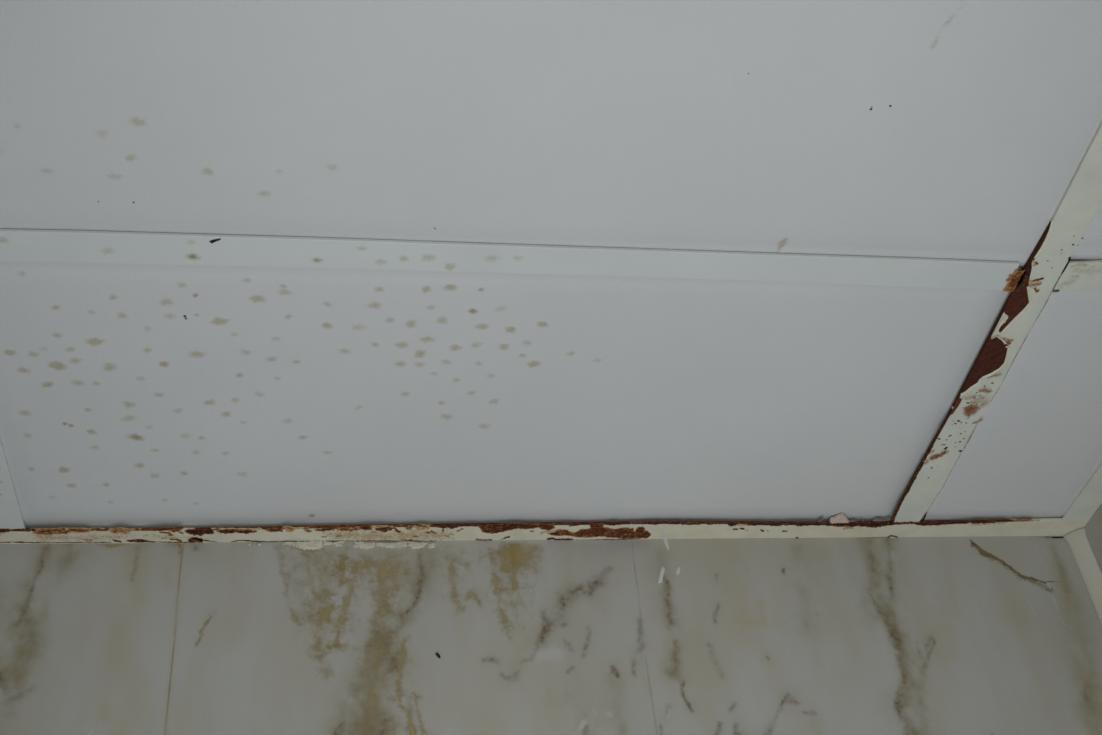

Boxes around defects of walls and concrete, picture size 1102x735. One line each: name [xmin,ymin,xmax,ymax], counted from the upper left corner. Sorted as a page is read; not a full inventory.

rust [1003,268,1026,293]
peeling [950,220,1055,415]
rust [965,374,996,424]
rust [0,407,1038,543]
leakage [493,544,535,594]
crack [970,539,1054,591]
leakage [319,558,408,647]